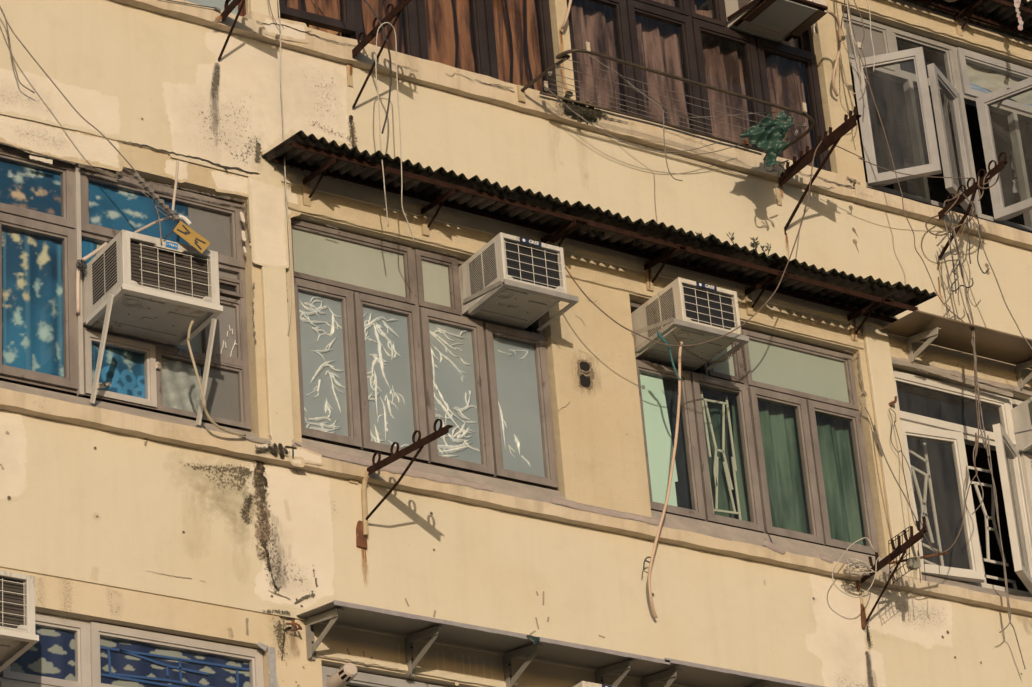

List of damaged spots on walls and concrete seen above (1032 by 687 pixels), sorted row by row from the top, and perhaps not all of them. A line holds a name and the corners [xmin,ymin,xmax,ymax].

water stain [211,63,220,125]
water stain [254,143,269,164]
mould [184,443,297,593]
water stain [865,621,874,687]